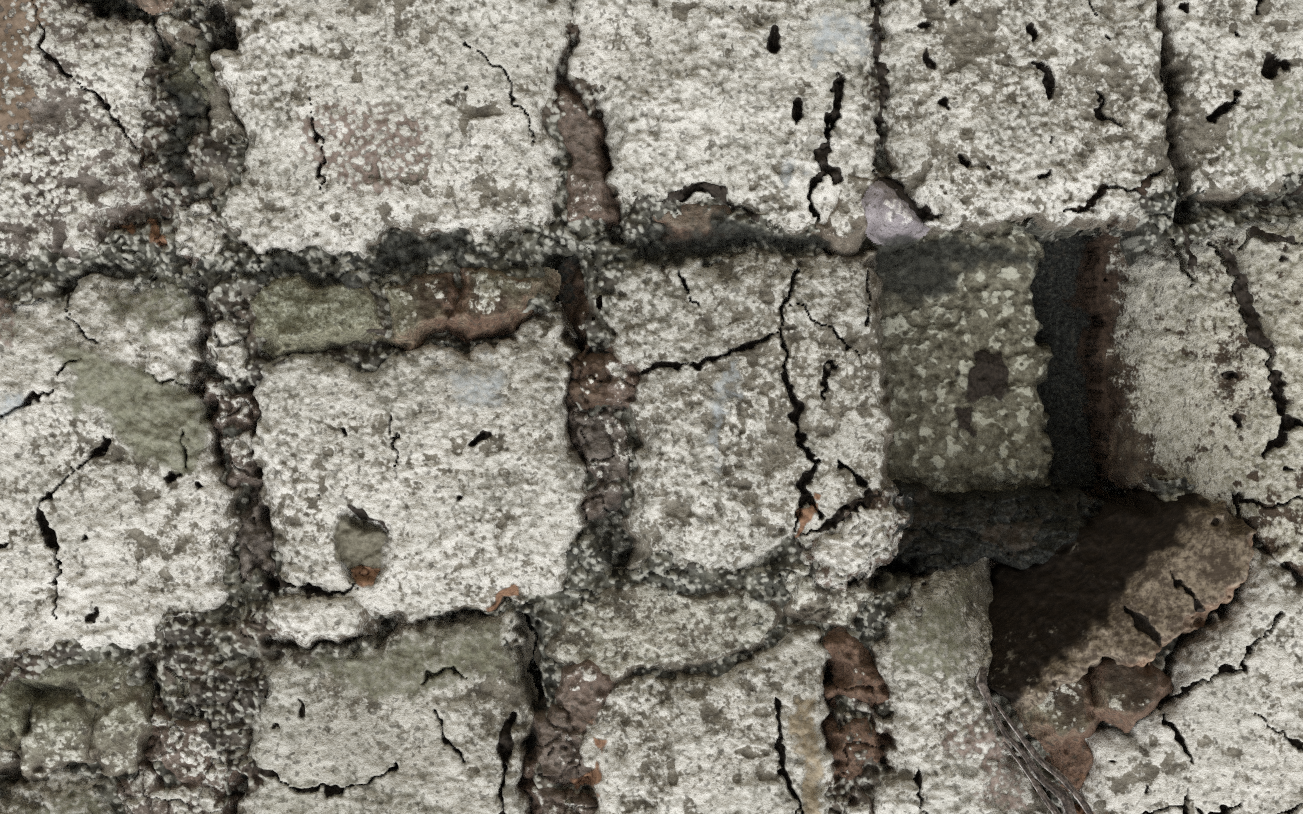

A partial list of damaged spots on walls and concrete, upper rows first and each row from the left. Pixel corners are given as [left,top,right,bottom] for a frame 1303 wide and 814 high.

crack [37,26,148,169]
peeling [250,267,561,359]
crack [639,270,881,532]
damp [875,236,1035,305]
damp [955,350,1009,437]
damp [1065,216,1131,499]
crack [1181,183,1303,457]
crack [36,491,62,602]
spalling [334,505,388,588]
crack [774,698,805,814]
peeling [1015,657,1173,795]
crack [1157,612,1282,762]